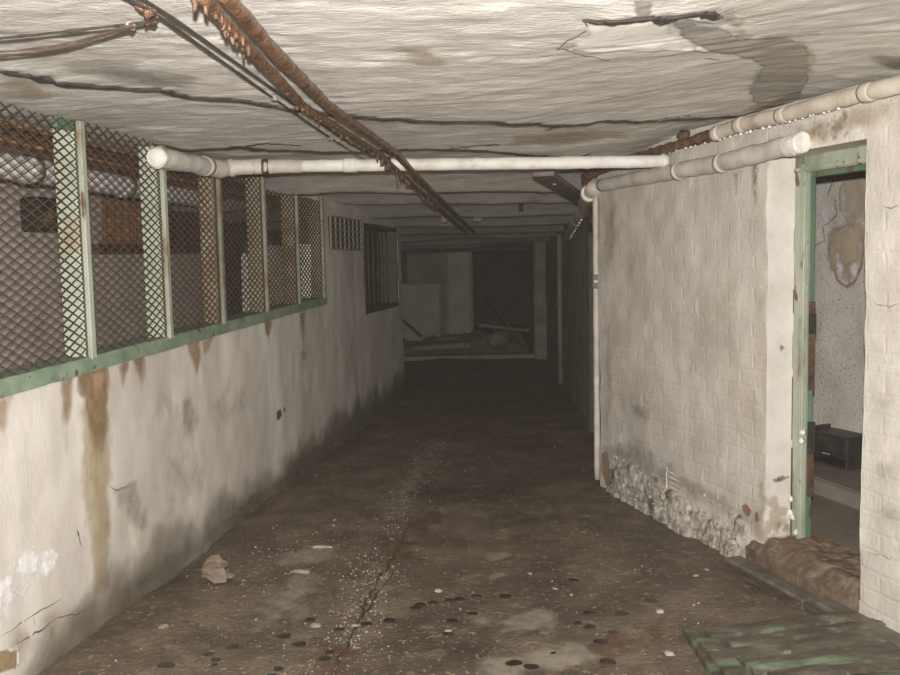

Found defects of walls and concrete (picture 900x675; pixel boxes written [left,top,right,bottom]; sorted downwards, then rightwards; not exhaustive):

rust [192,0,251,60]
leakage [635,1,651,17]
flaking render [556,11,816,61]
leakage [675,18,811,107]
crack [0,70,757,157]
leakage [828,171,866,288]
rust [63,367,108,435]
flaking render [601,453,758,558]
rust [806,454,814,497]
leakage [0,547,59,618]
crack [3,599,83,645]
crack [333,523,411,671]